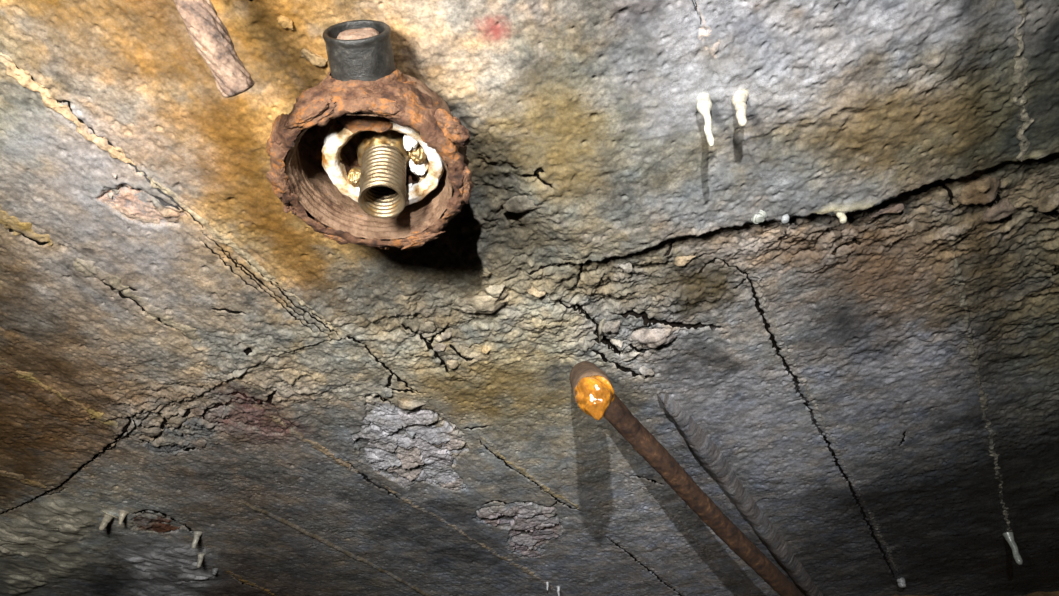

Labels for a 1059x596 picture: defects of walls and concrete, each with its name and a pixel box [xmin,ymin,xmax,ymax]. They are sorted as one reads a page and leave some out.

spalling [95,183,188,227]
crack [56,100,441,417]
crack [831,239,861,255]
crack [921,153,1059,205]
crack [1034,210,1059,218]
crack [398,320,473,373]
crack [527,254,721,378]
crack [3,390,277,512]
spalling [350,388,469,492]
crack [464,426,580,525]
crack [698,258,894,577]
spalling [472,501,565,558]